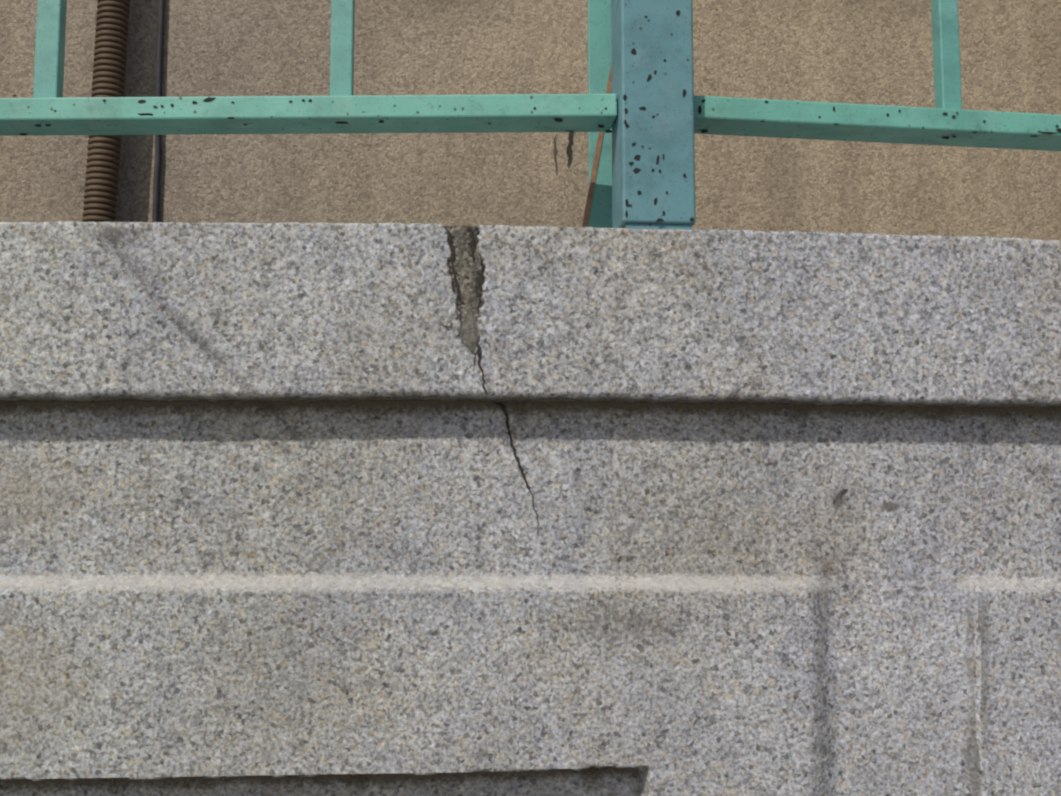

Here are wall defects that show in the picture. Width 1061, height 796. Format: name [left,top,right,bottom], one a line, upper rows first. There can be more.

crack [473,326,539,535]